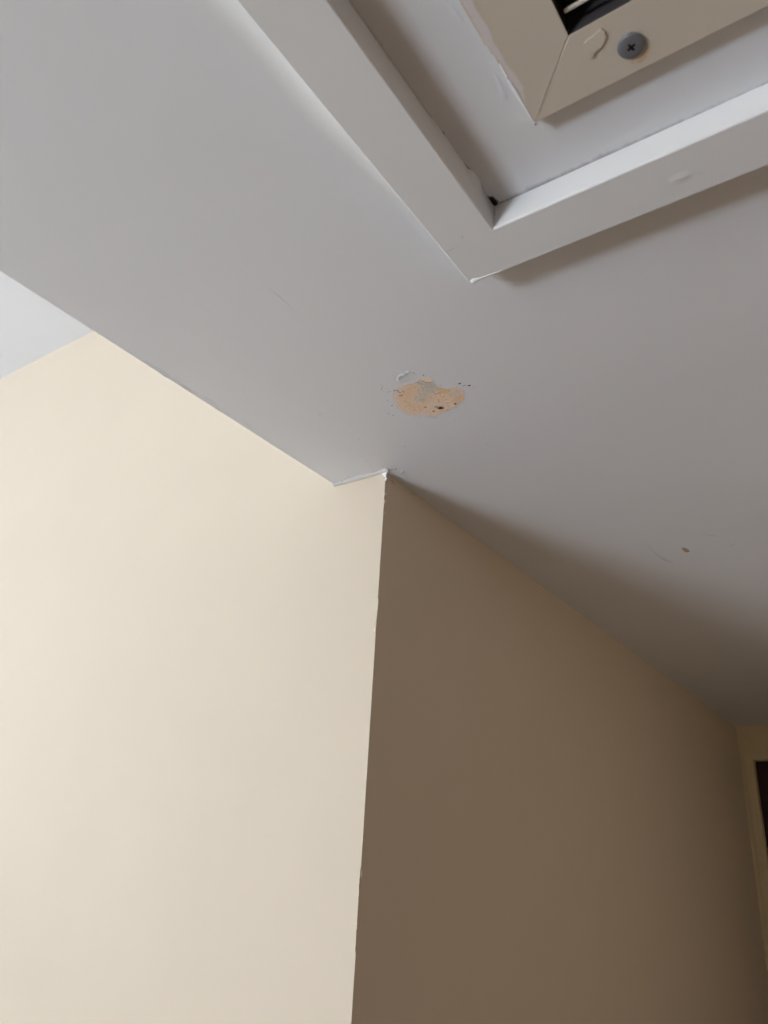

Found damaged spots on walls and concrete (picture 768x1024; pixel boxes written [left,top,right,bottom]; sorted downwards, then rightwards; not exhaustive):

spalling [381,370,475,420]